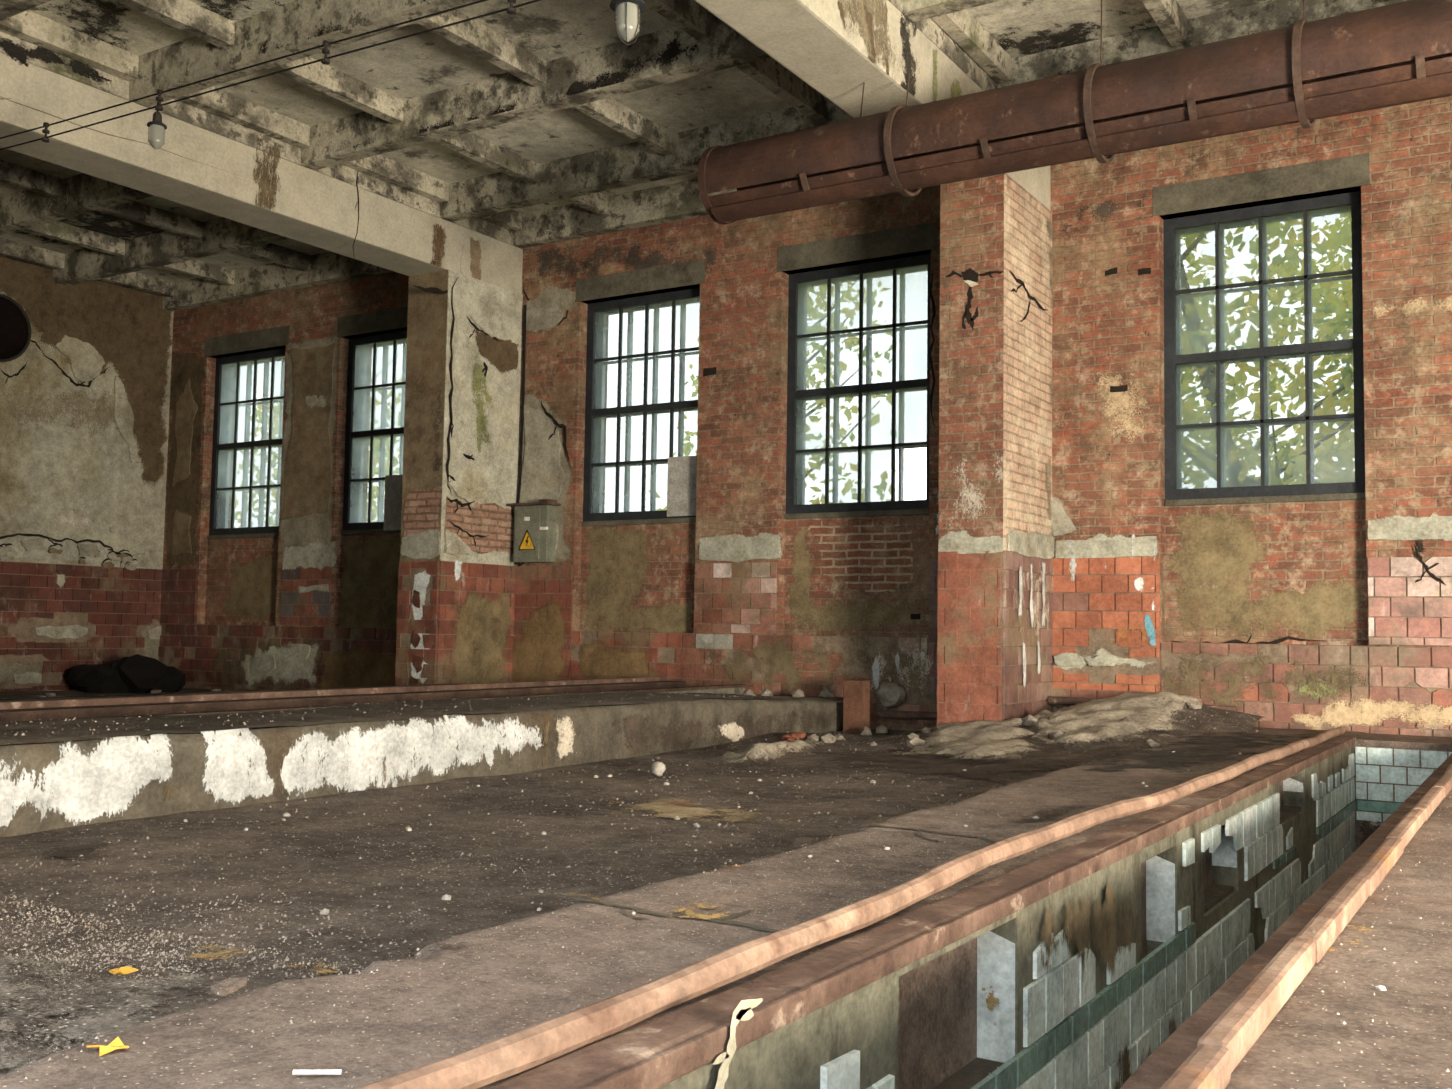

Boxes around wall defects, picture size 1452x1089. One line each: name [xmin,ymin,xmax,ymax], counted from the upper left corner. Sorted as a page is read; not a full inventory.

damp [34,0,135,51]
damp [193,0,298,20]
mould [0,38,112,84]
mould [390,36,714,138]
peeling [470,305,564,374]
crack [928,269,1047,427]
peeling [0,256,205,588]
crack [0,533,139,557]
peeling [400,405,566,685]
peeling [699,536,779,563]
crack [1414,544,1446,585]
spalling [241,638,321,689]